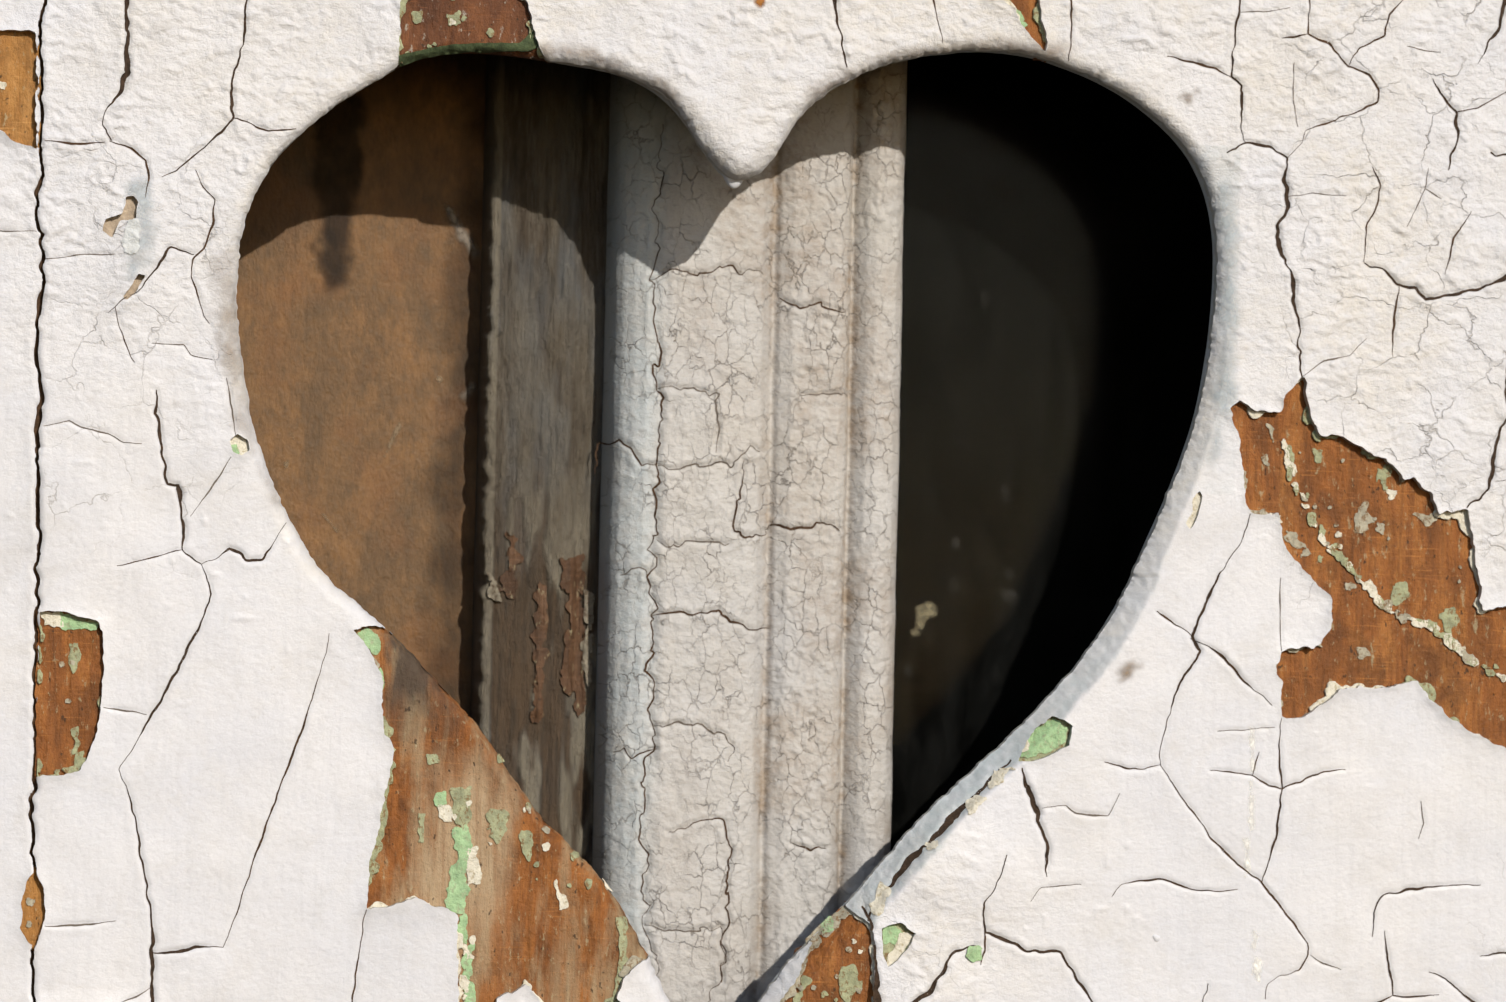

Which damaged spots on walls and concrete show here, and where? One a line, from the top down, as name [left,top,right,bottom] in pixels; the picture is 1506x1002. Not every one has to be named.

peeling [0,29,41,152]
peeling [396,0,548,68]
crack [1169,0,1506,378]
peeling [35,610,104,780]
crack [0,0,329,1002]
peeling [354,626,648,1002]
crack [594,131,848,1002]
peeling [780,881,914,1002]
crack [861,516,1346,1002]
peeling [1231,378,1506,748]
crack [1372,884,1479,1002]
crack [1466,379,1506,508]